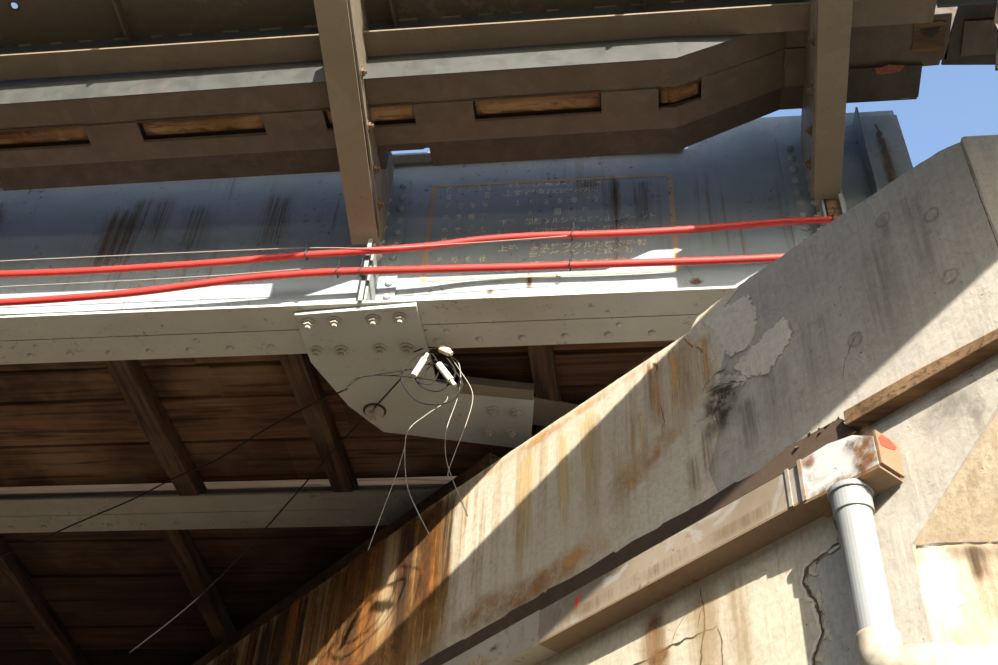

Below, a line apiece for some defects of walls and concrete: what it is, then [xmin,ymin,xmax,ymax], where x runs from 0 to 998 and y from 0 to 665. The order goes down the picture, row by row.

corrosion [874,124,894,183]
crack [684,338,746,393]
peeling [691,295,794,427]
corrosion [849,435,876,474]
crack [916,540,998,548]
crack [633,586,723,665]